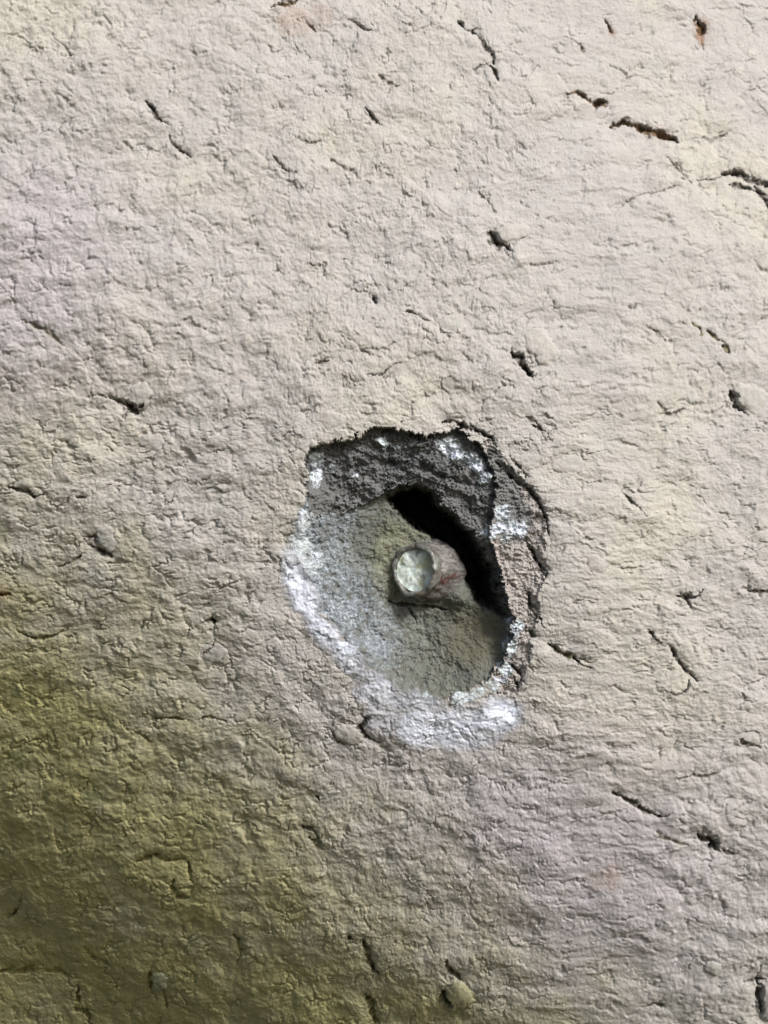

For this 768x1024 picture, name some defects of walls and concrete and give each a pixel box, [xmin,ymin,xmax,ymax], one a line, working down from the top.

crack [457,22,500,82]
crack [621,156,768,209]
spalling [526,416,554,442]
spalling [292,427,549,701]
crack [646,628,699,696]
crack [611,791,689,847]